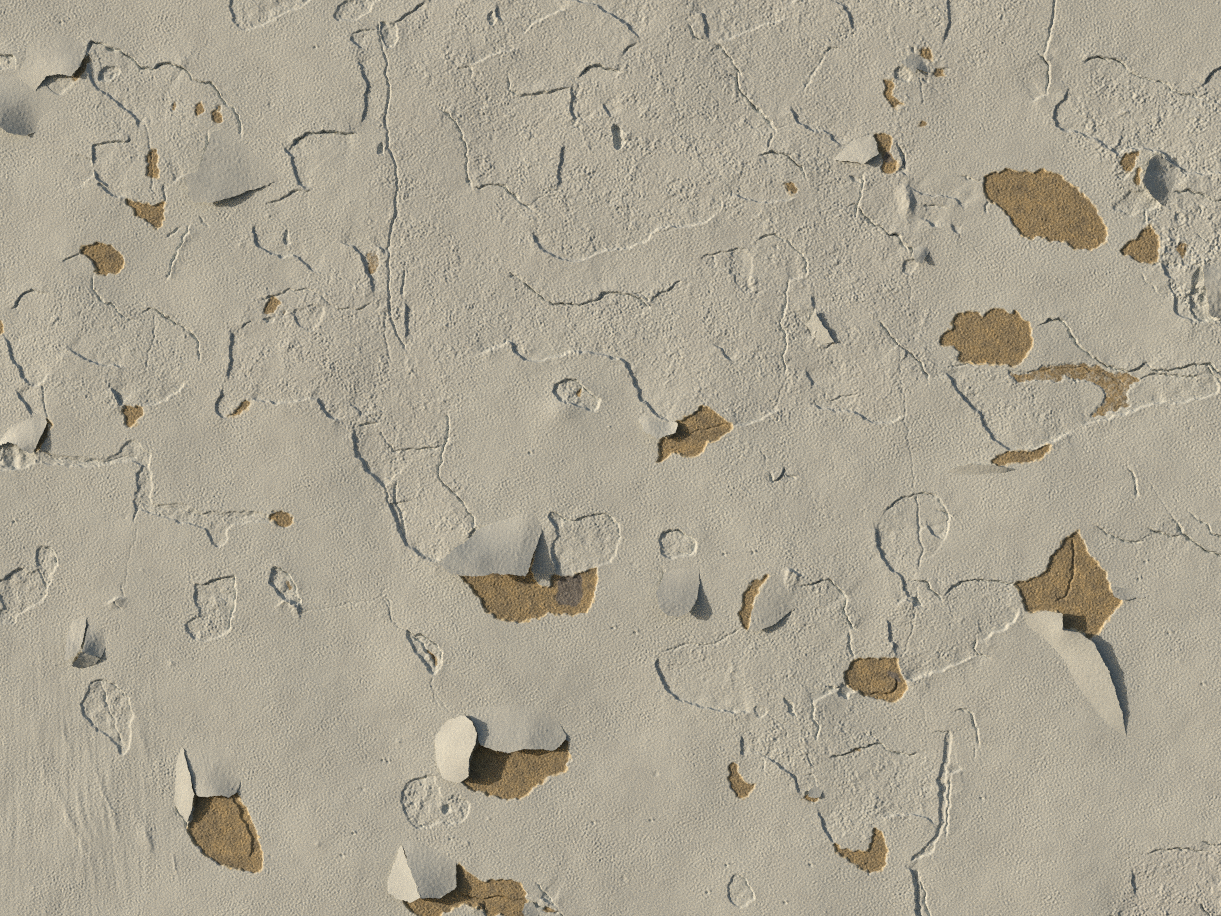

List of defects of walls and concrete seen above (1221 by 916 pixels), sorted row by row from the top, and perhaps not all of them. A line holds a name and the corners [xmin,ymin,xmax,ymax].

crack [34,438,335,607]
peeling [0,0,382,282]
crack [375,20,417,364]
peeling [213,224,624,626]
crack [507,271,687,315]
spalling [807,490,1151,736]
spalling [910,87,1221,326]
crack [1004,315,1221,428]
crack [1084,53,1221,102]
peeling [169,744,266,876]
peeling [268,564,573,916]
crack [905,703,983,916]